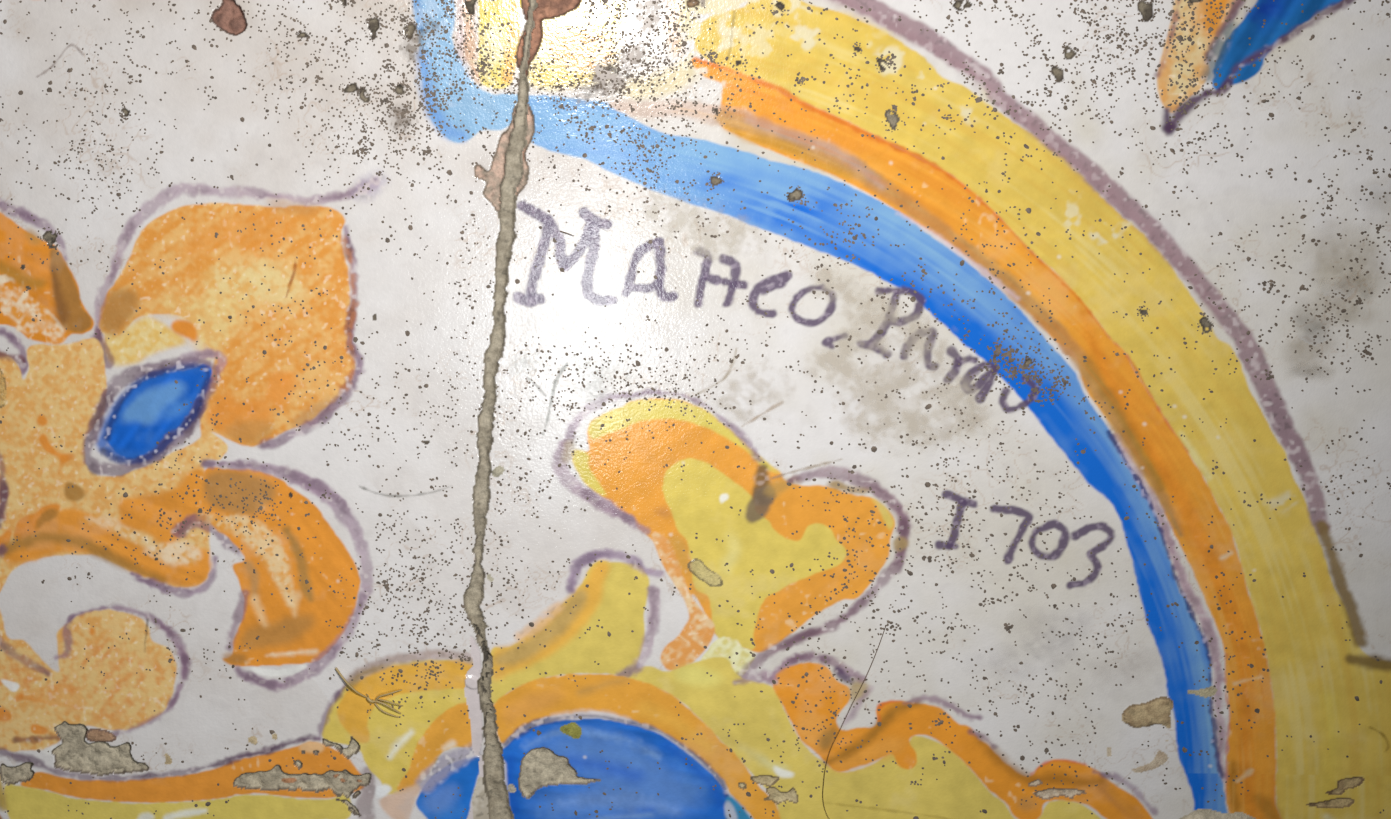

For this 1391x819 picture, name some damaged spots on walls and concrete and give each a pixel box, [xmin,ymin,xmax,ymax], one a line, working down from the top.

crack [464,0,539,819]